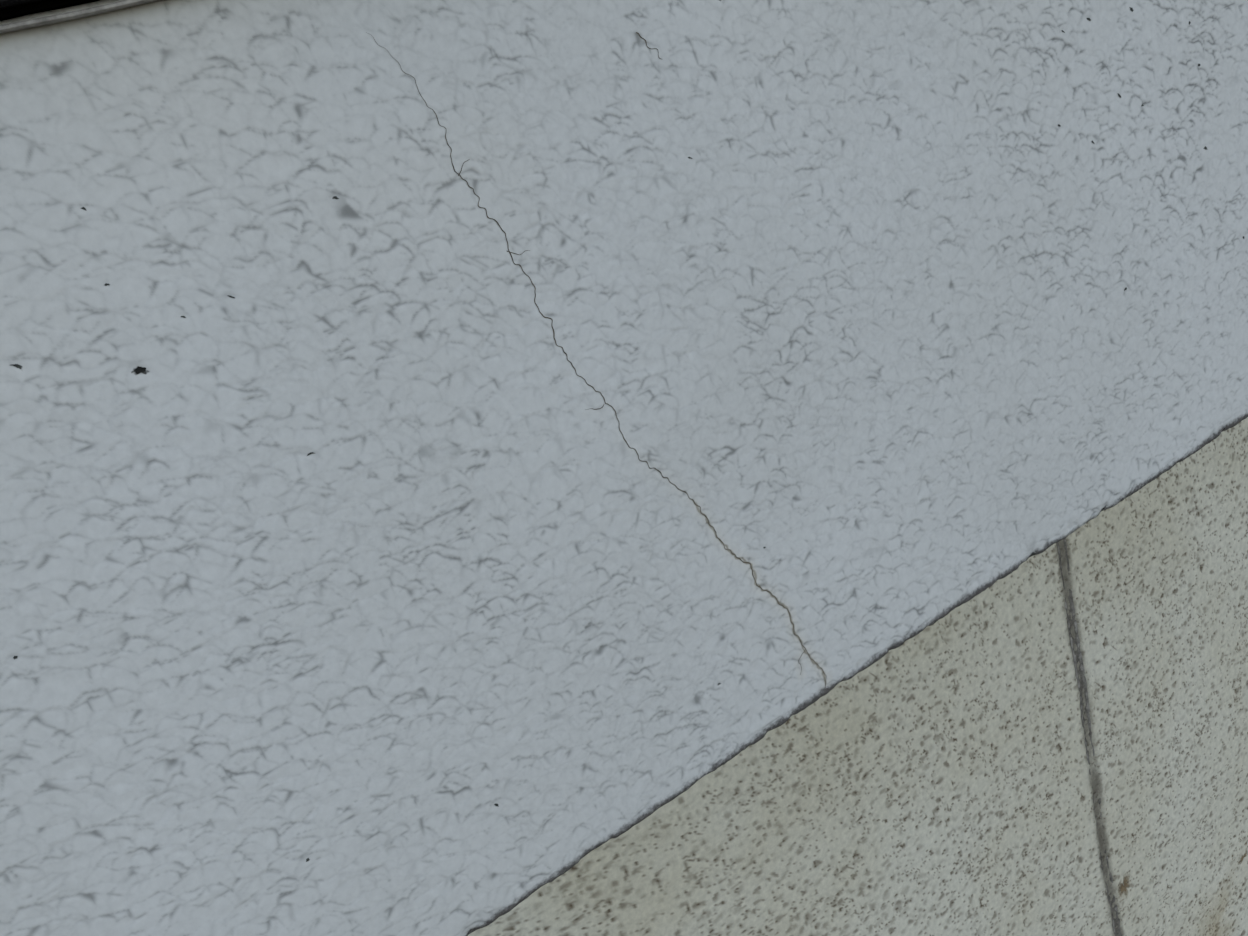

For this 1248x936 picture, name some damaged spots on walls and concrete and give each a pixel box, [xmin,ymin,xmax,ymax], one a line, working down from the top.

crack [366,32,827,687]